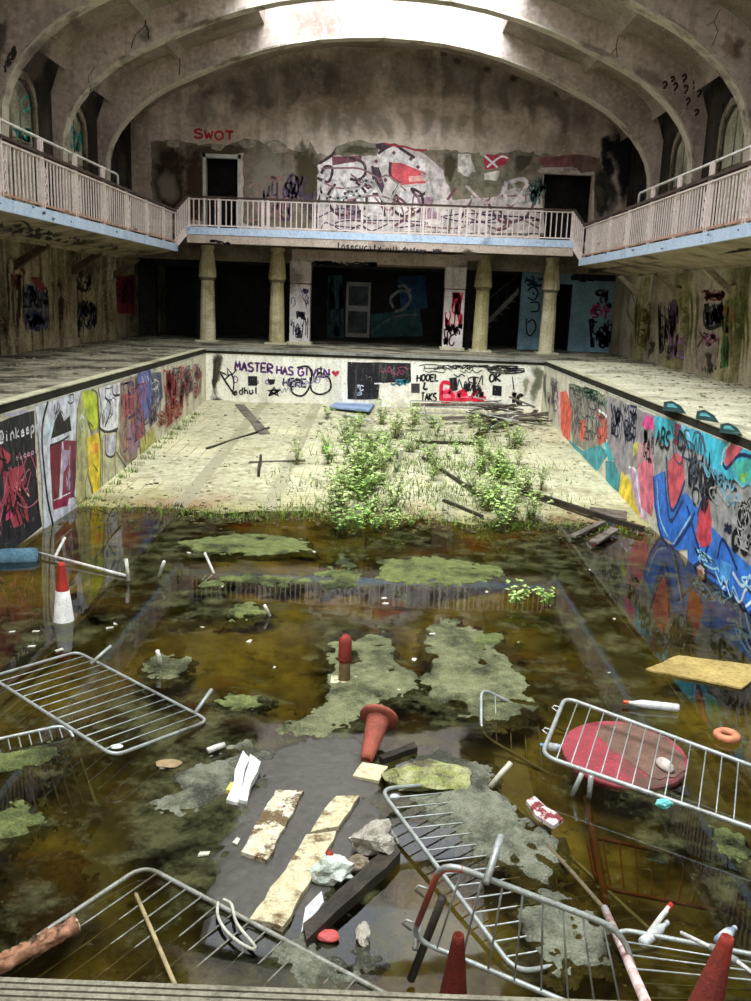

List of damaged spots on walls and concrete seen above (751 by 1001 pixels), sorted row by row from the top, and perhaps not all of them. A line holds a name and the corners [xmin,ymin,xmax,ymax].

flaking render [150,138,387,229]
water stain [594,132,632,213]
water stain [679,294,699,347]
water stain [724,294,749,357]